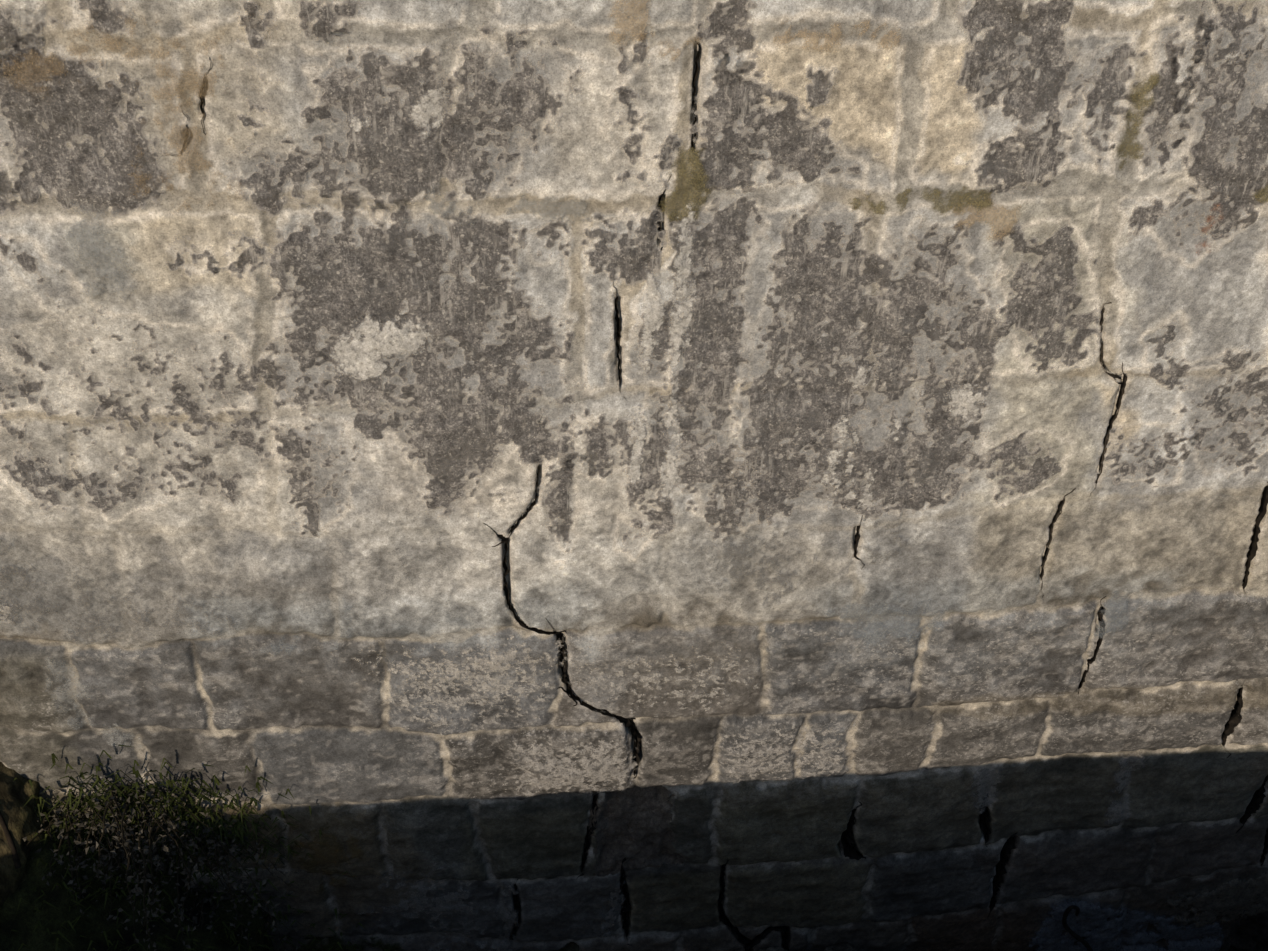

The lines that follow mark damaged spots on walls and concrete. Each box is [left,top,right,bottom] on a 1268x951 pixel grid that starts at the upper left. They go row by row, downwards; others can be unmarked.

peeling [956,0,1268,248]
crack [613,282,621,391]
crack [1040,300,1127,597]
crack [483,416,641,780]
crack [576,782,598,880]
crack [1260,828,1268,871]
crack [718,859,789,951]